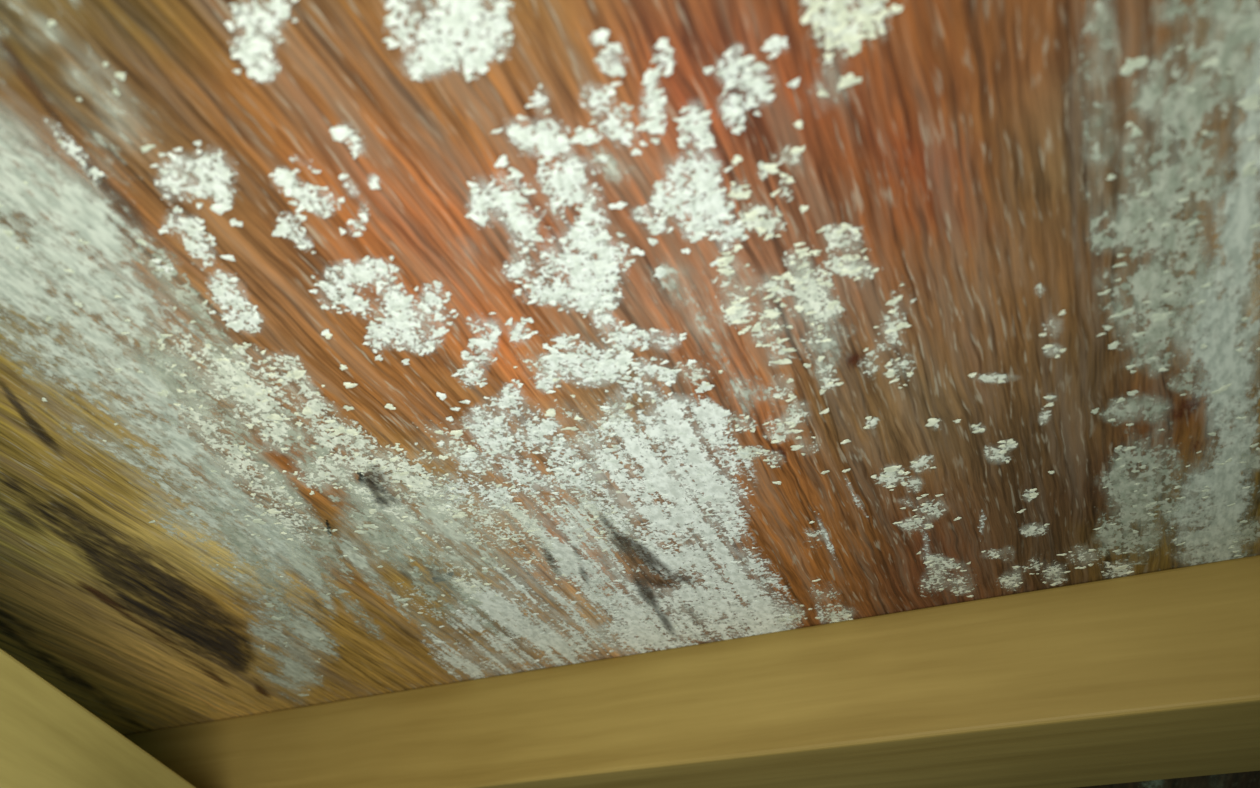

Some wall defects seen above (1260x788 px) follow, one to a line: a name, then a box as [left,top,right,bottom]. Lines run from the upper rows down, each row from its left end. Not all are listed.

water stain [383,0,515,82]
water stain [800,0,903,100]
water stain [982,0,1260,591]
water stain [0,29,916,699]
water stain [968,372,1007,383]
water stain [925,418,1018,463]
water stain [871,455,975,597]